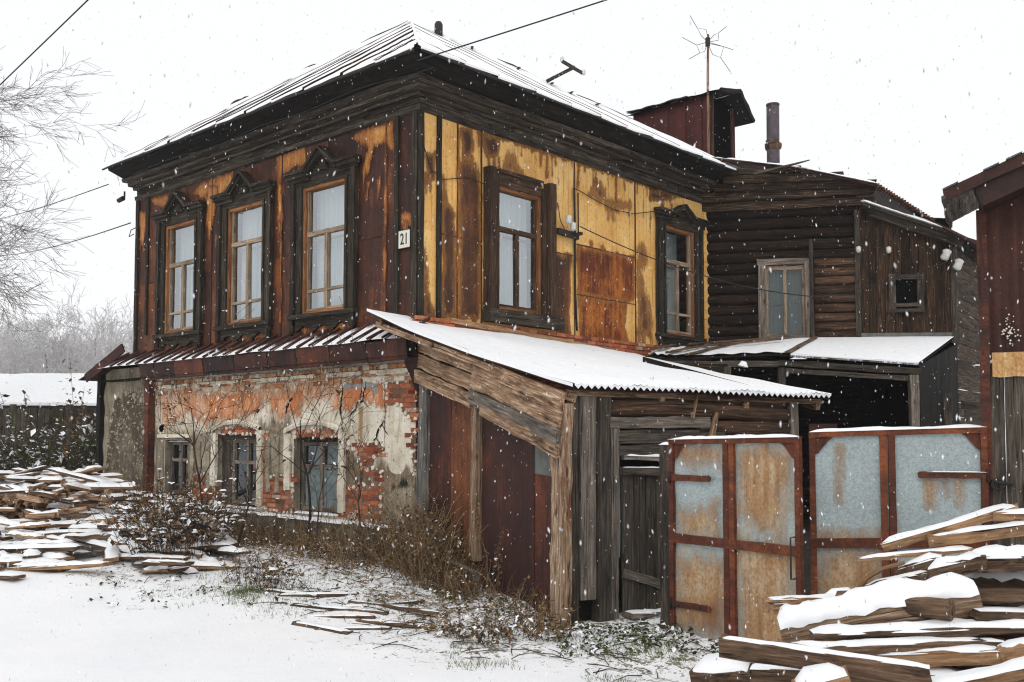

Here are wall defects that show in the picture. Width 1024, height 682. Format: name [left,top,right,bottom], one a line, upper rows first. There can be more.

corrosion [424,127,682,323]
corrosion [556,240,654,344]
spalling [158,390,300,514]
spalling [274,390,388,521]
spalling [330,380,419,477]
corrosion [679,505,718,537]
corrosion [676,555,724,633]
corrosion [739,443,789,535]
corrosion [739,540,795,642]
corrosion [818,530,879,594]